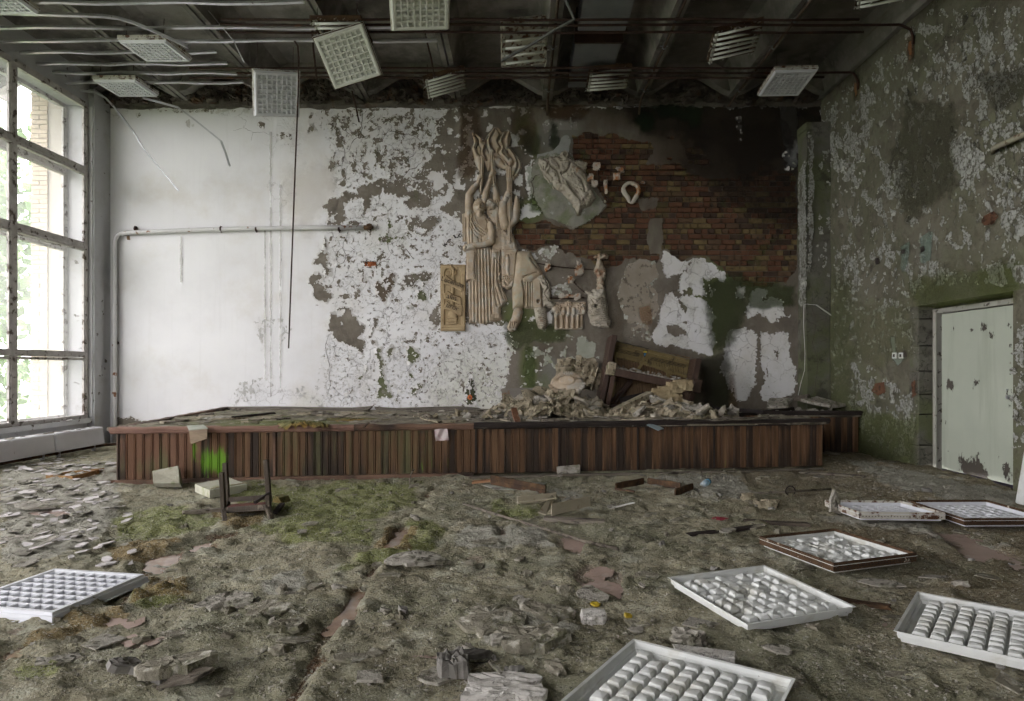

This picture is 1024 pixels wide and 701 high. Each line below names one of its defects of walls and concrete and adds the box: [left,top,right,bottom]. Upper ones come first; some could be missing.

flaking render [300,6,1024,448]
water stain [896,94,954,221]